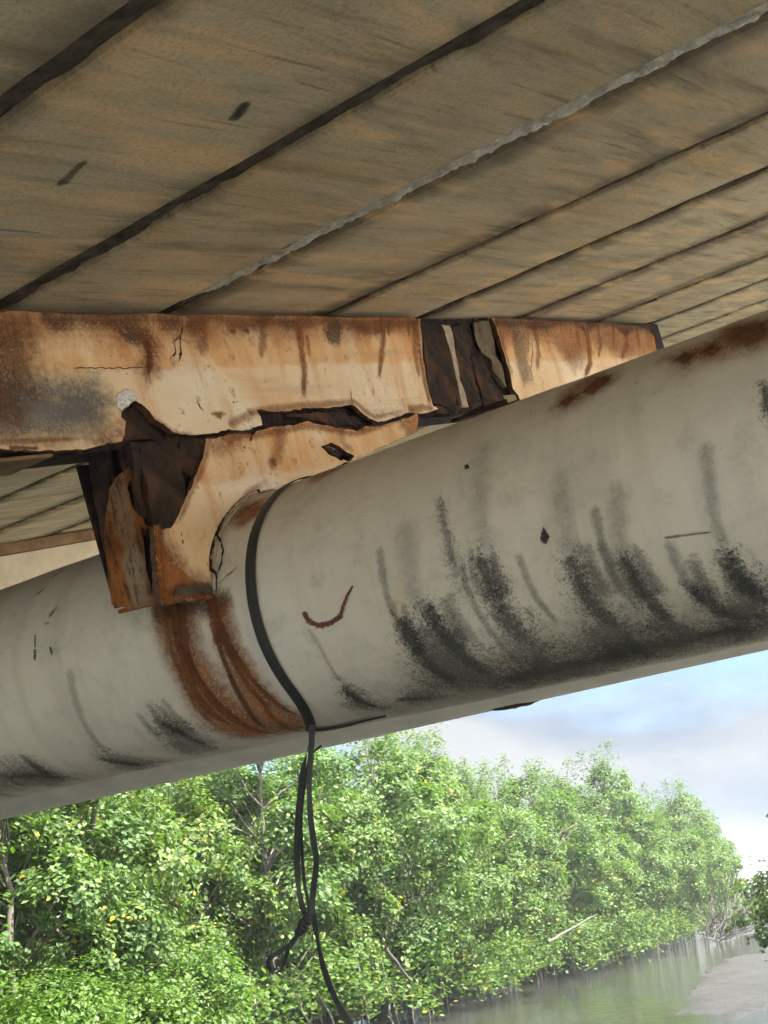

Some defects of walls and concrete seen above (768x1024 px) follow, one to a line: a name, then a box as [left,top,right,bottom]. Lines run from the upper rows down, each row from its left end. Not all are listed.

spalling [248,407,374,434]
spalling [77,389,205,538]
spalling [321,446,349,468]
peeling [160,583,213,605]
peeling [302,586,353,629]